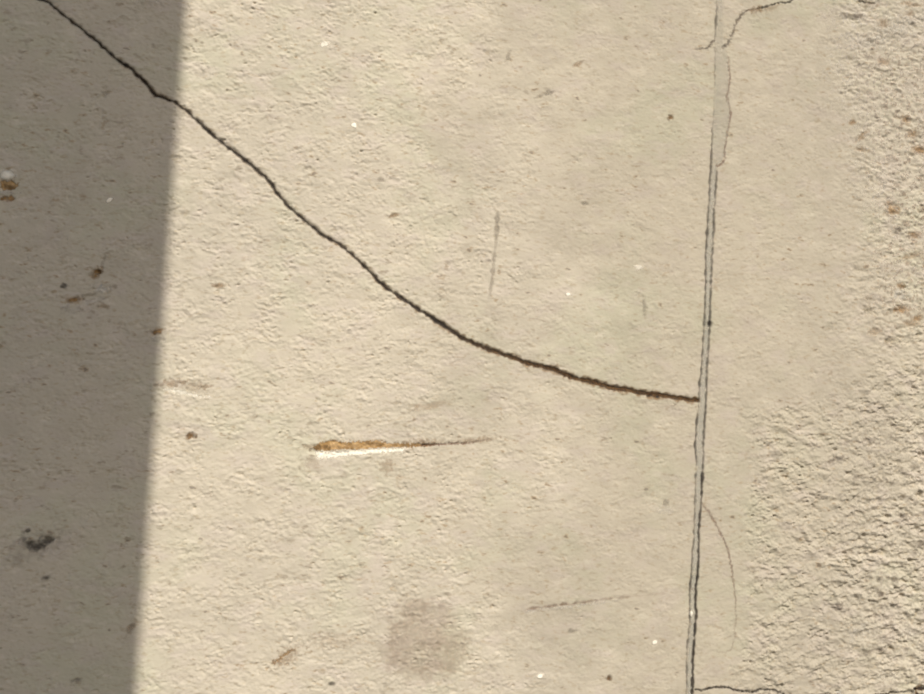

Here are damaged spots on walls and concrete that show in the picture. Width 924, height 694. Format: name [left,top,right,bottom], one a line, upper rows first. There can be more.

crack [40,0,706,447]
crack [689,467,784,694]
crack [885,684,924,694]